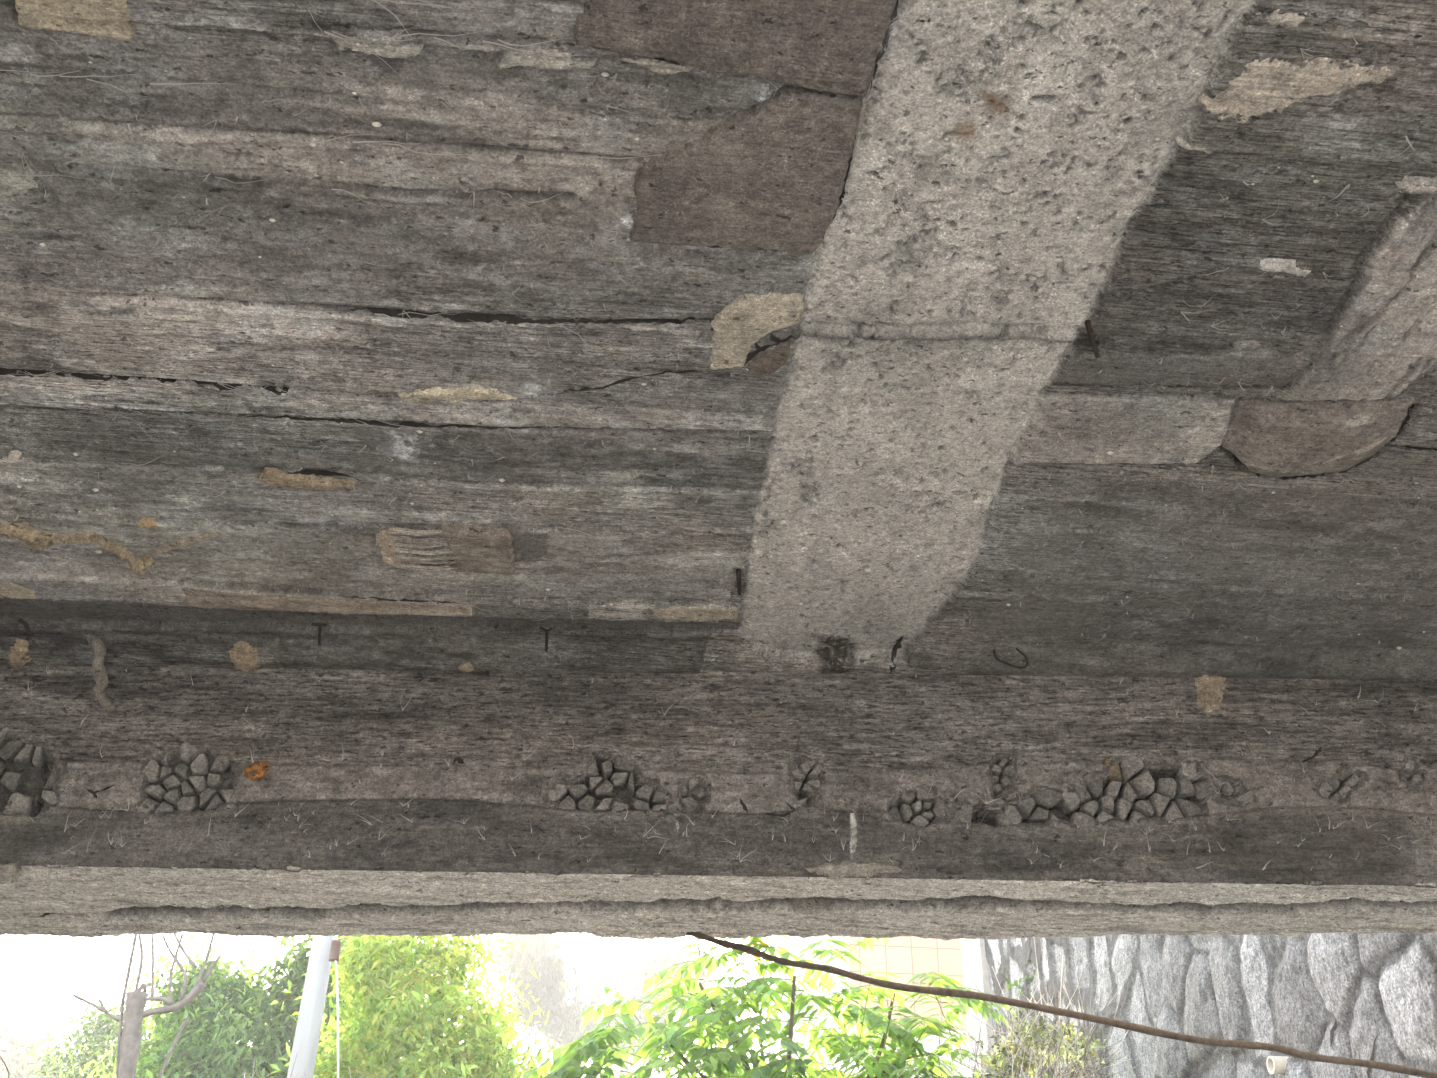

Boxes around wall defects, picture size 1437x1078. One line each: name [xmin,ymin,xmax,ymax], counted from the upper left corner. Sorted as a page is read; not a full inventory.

spalling [1198,57,1396,124]
crack [339,308,706,325]
spalling [709,292,805,370]
crack [0,334,801,430]